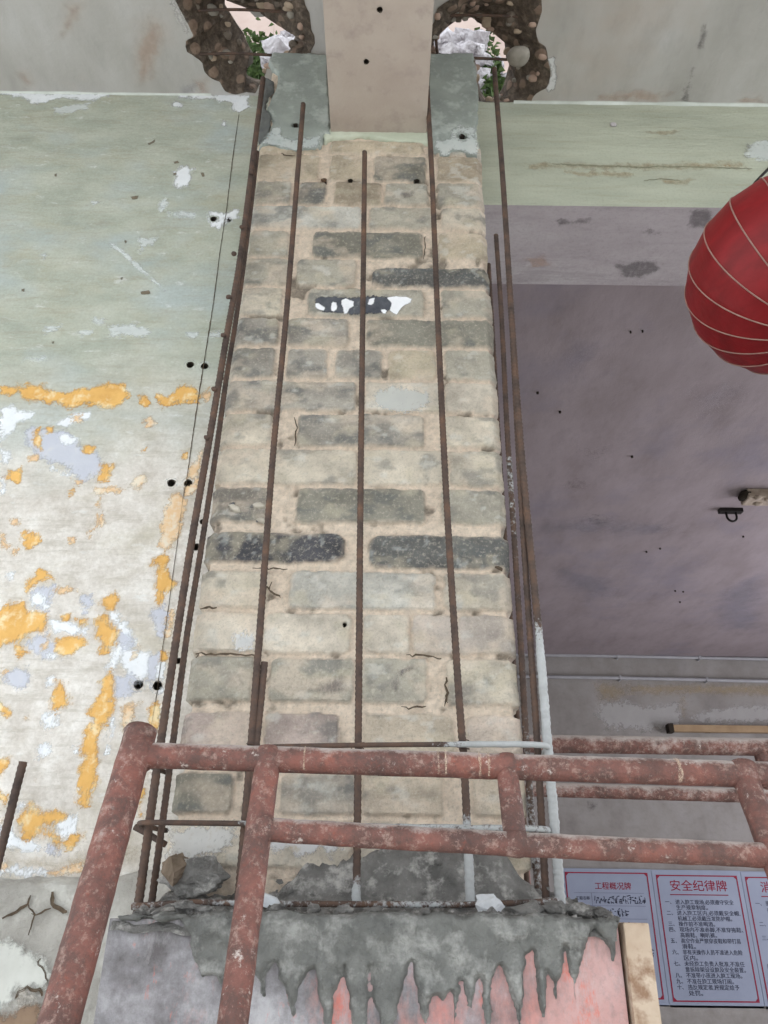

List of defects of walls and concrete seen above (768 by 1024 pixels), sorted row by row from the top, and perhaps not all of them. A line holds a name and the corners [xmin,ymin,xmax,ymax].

spalling [0,0,315,878]
crack [2,891,67,935]